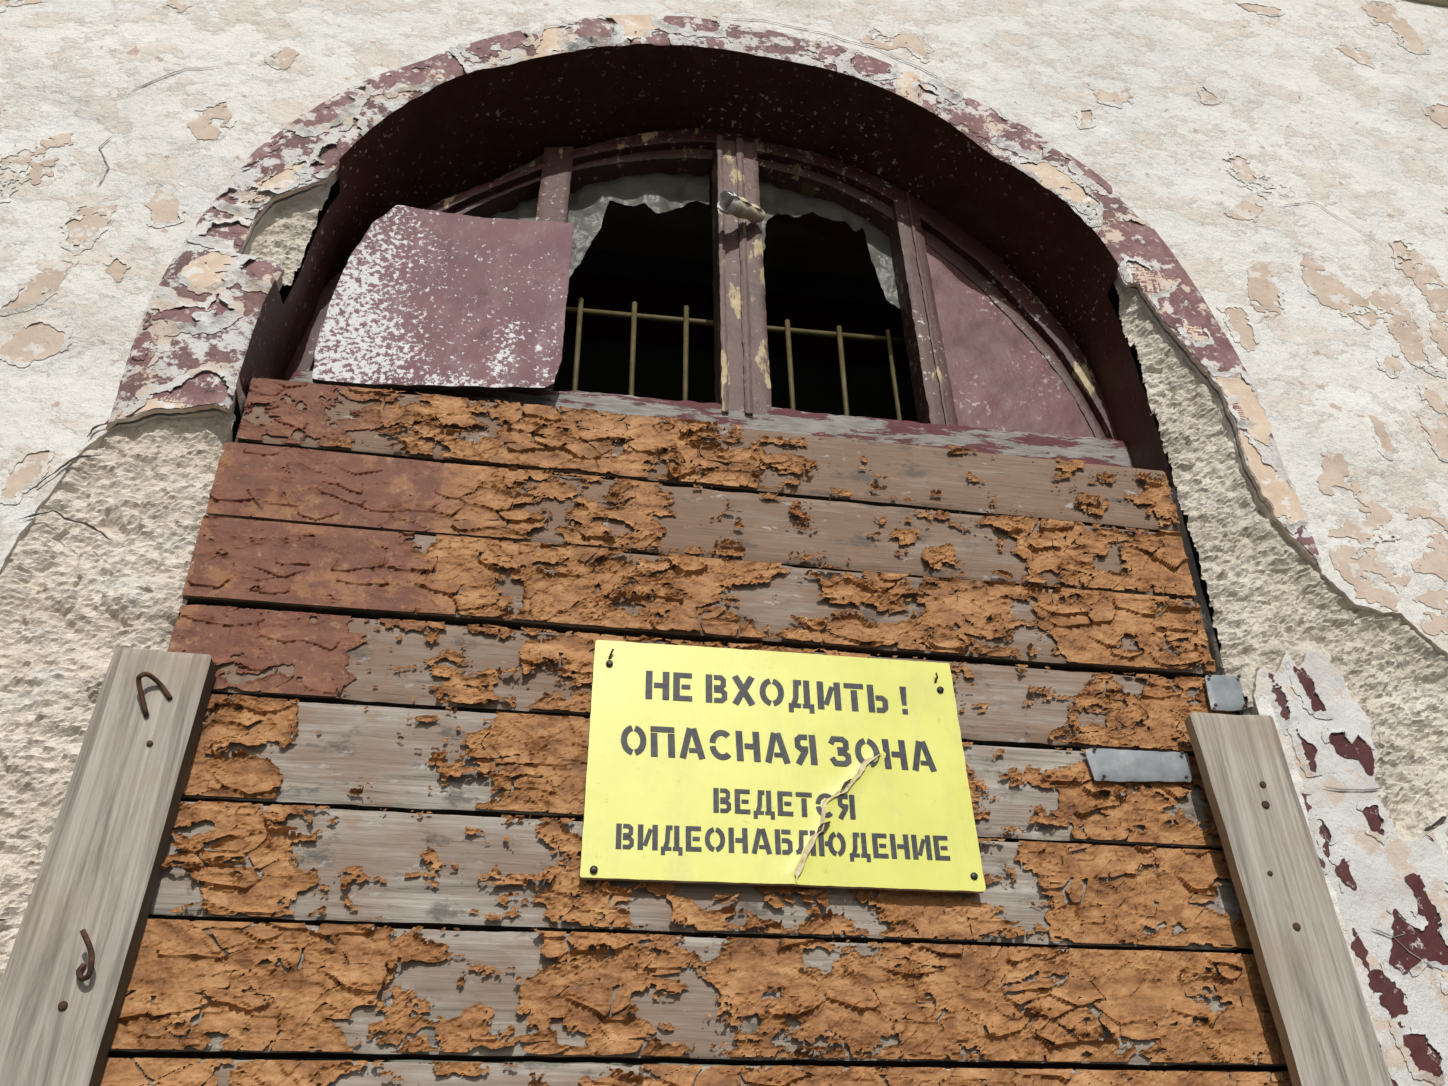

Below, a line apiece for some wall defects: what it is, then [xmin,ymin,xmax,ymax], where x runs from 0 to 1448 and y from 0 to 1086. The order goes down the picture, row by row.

peeling [264,47,299,70]
peeling [0,132,75,203]
peeling [0,204,118,368]
flaking render [142,79,437,336]
crack [20,420,113,541]
flaking render [0,238,1448,1086]